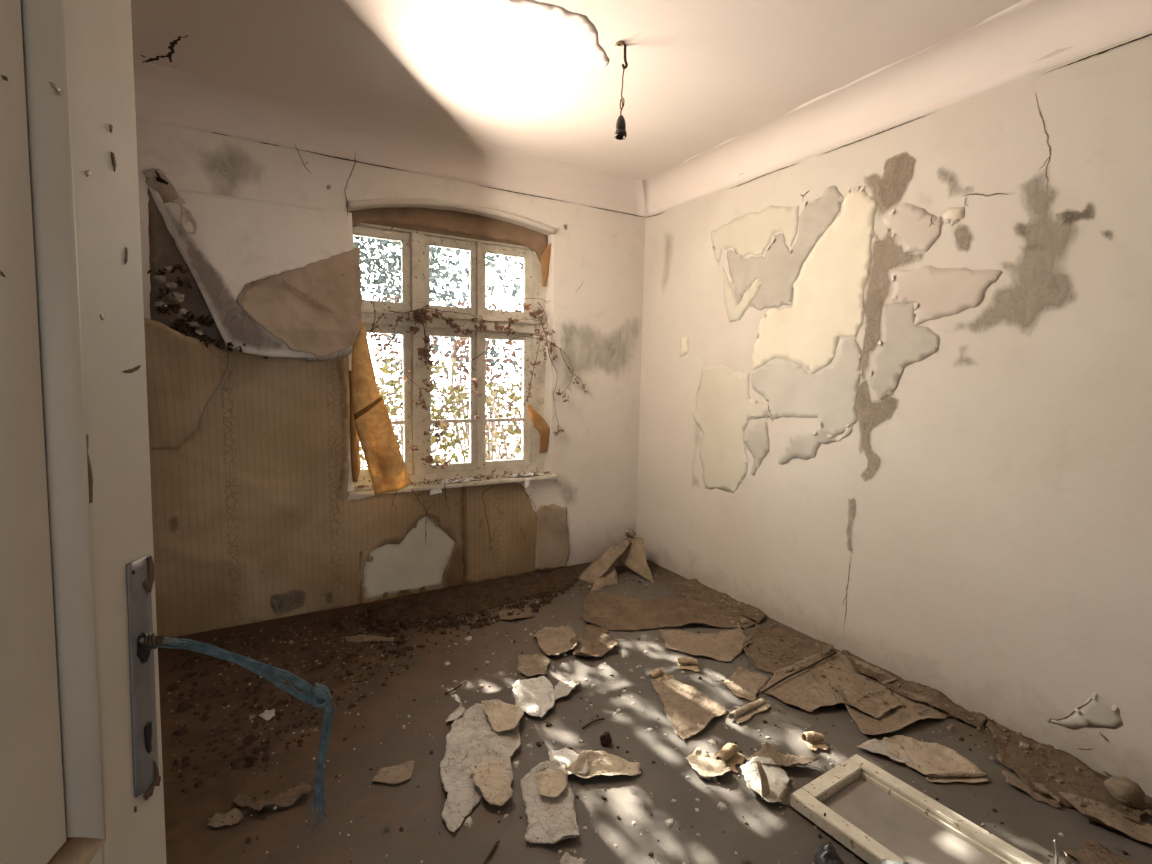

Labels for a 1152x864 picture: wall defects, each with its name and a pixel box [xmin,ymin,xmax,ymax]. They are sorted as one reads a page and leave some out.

crack [140,35,189,63]
crack [1035,33,1152,187]
peeling [147,188,226,347]
peeling [693,186,1003,493]
peeling [363,516,455,599]
crack [843,561,851,623]
peeling [1048,691,1123,730]